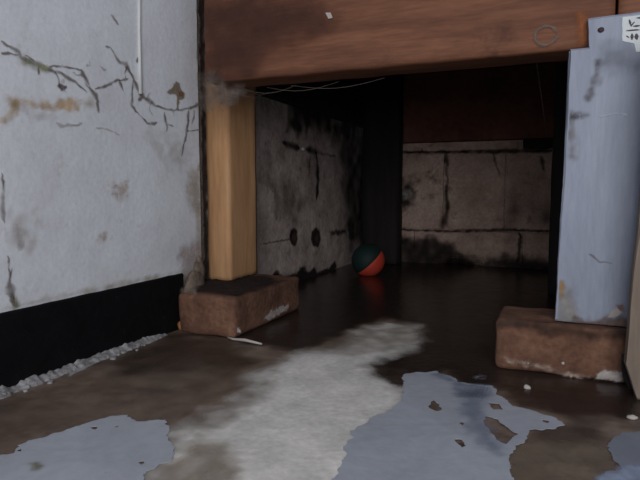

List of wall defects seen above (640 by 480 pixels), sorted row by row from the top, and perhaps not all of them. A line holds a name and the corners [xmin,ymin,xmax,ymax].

rust [31,98,78,110]
crack [1,41,199,156]
rust [168,82,184,108]
damp [181,0,321,285]
crack [282,141,319,201]
damp [289,106,363,245]
crack [402,148,552,261]
damp [116,334,253,376]
damp [238,237,640,419]